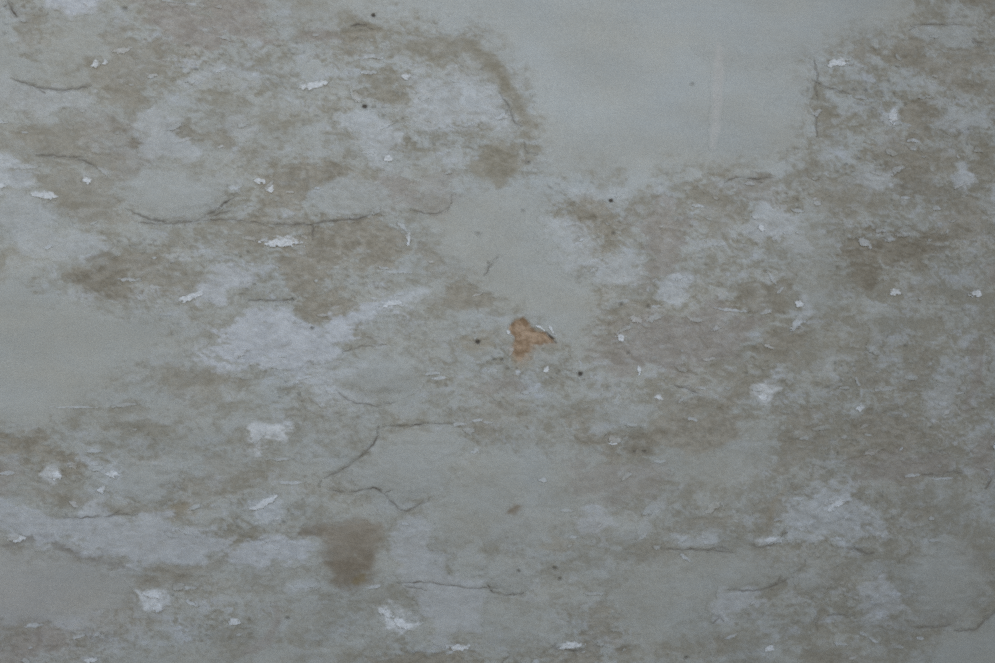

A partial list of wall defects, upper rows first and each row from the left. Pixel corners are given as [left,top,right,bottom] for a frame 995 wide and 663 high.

peeling [0,0,179,233]
peeling [349,55,417,113]
peeling [823,27,995,298]
peeling [202,148,427,330]
flaking render [434,276,563,370]
peeling [557,159,810,422]
peeling [0,424,90,479]
crack [318,392,460,513]
peeling [446,386,540,454]
peeling [561,403,647,464]
peeling [361,636,488,663]
peeling [532,592,640,663]